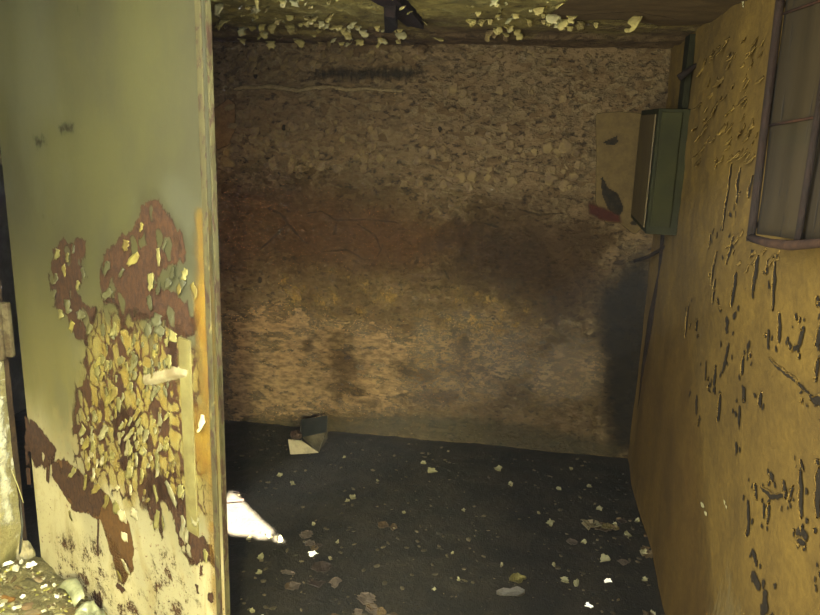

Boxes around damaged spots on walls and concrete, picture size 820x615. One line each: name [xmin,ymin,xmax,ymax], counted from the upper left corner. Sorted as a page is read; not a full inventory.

peeling [212,0,407,53]
corrosion [24,415,140,615]
corrosion [48,199,217,615]
peeling [72,310,206,515]